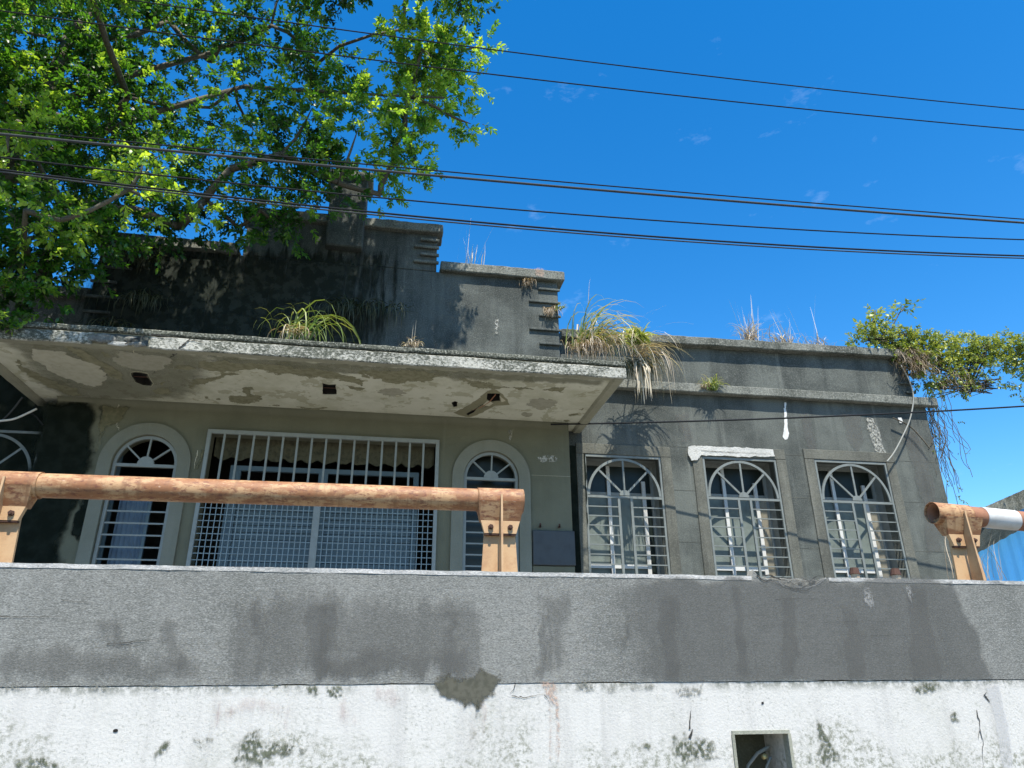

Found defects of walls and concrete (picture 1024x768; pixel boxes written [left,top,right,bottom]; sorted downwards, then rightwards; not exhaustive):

peeling [16,333,439,406]
water stain [0,343,600,475]
spalling [452,378,565,417]
water stain [13,498,89,563]
water stain [234,731,304,765]
water stain [673,733,714,763]
water stain [809,723,841,763]
crack [977,692,990,764]